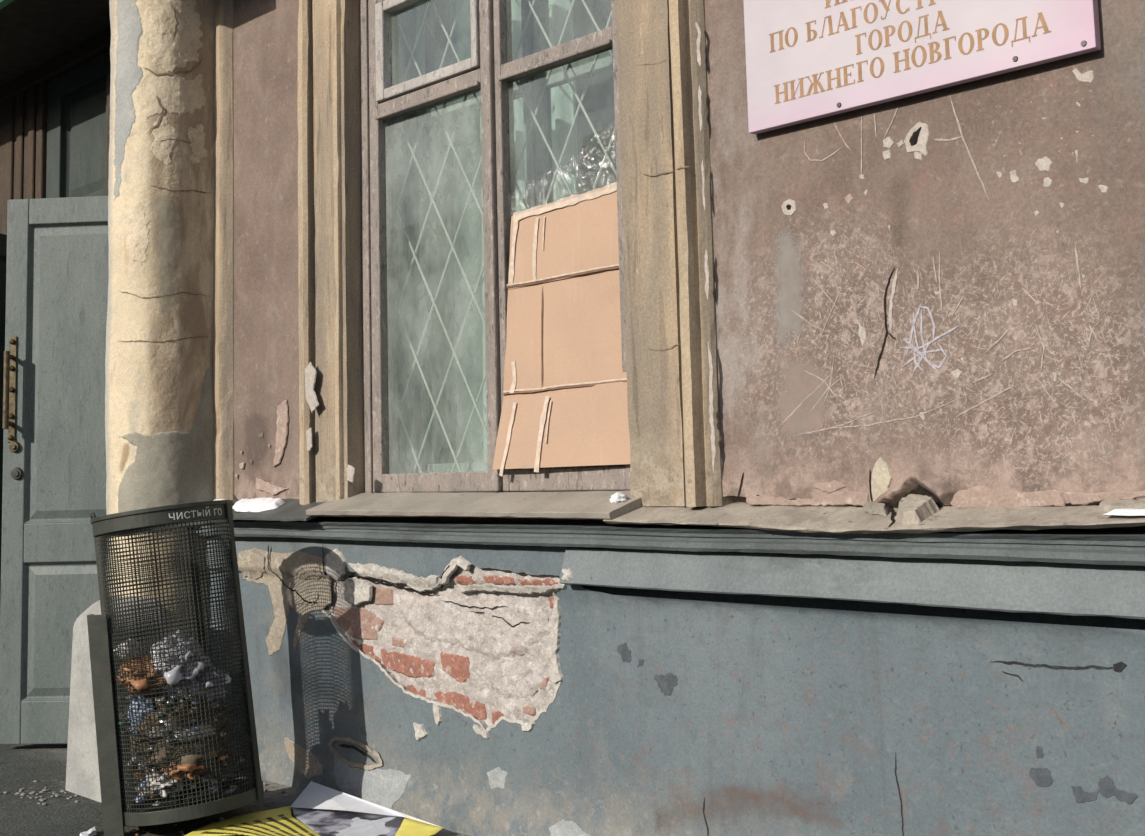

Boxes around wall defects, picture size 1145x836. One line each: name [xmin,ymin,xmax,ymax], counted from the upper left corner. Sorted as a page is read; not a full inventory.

peeling [134,0,208,166]
hole [882,122,930,161]
peeling [127,202,150,266]
crack [874,267,898,378]
peeling [304,362,319,414]
peeling [347,465,355,483]
flaking render [238,544,573,741]
crack [990,661,1128,681]
peeling [284,737,323,780]
peeling [549,819,590,836]